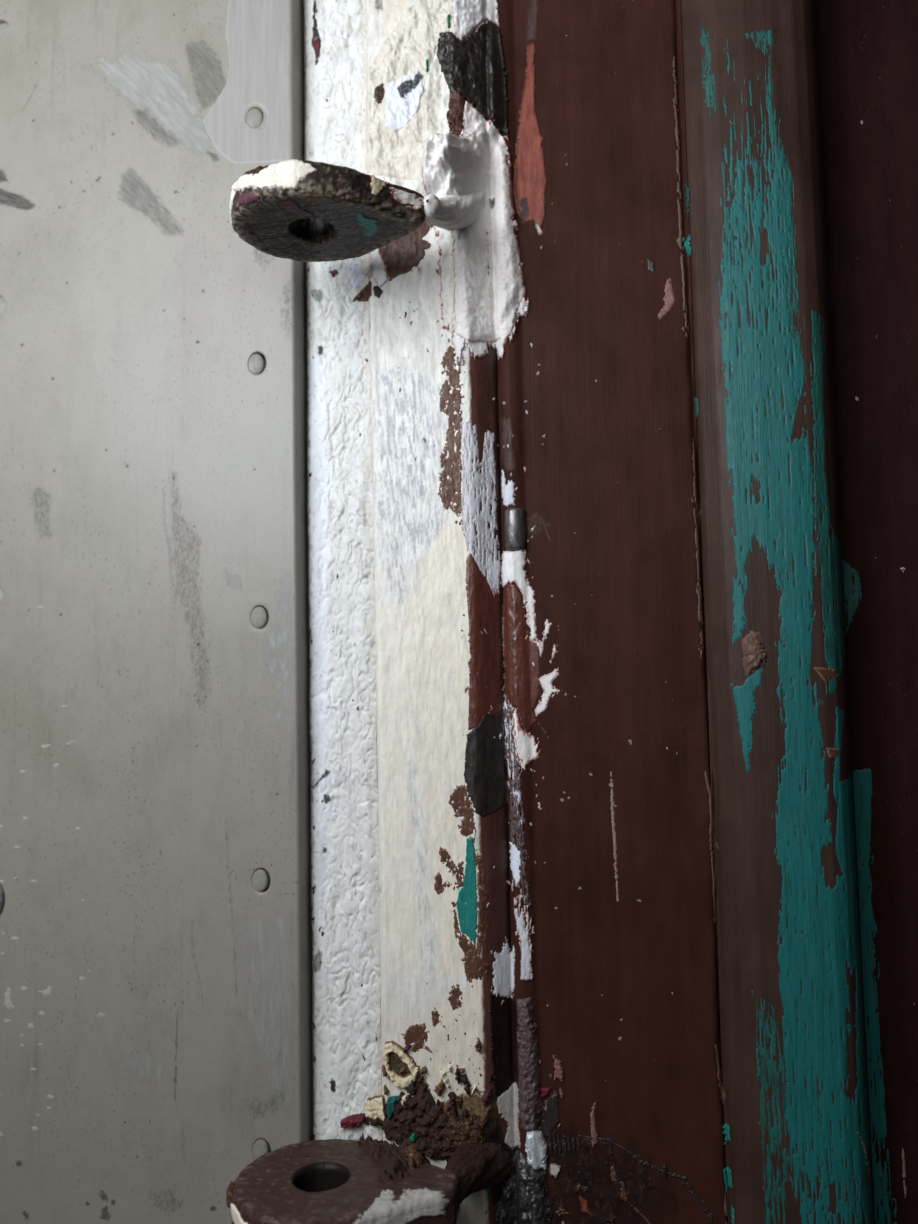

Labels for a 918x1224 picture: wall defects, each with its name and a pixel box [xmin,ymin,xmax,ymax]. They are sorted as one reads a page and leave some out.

peeling [448,88,463,137]
peeling [438,338,464,524]
peeling [463,553,558,738]
peeling [691,437,704,659]
peeling [700,27,907,1224]
peeling [401,785,492,1053]
peeling [512,880,535,980]
peeling [352,1188,450,1224]
corrosion [364,1013,502,1164]
peeling [484,1126,516,1159]